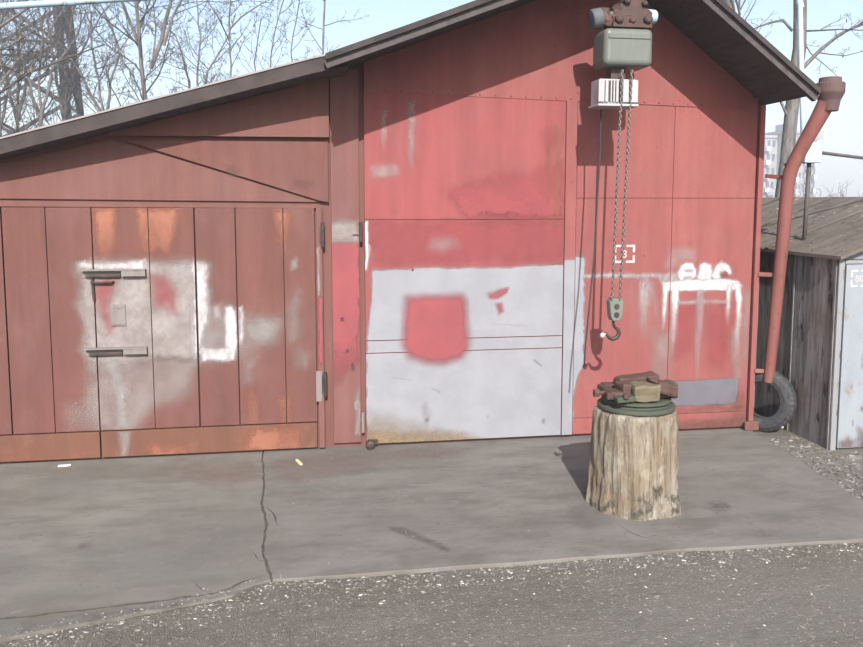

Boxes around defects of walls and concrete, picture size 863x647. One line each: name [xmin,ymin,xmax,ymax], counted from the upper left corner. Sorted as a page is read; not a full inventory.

corrosion [95,208,115,254]
corrosion [137,208,177,251]
corrosion [246,428,299,450]
crack [1,460,277,619]